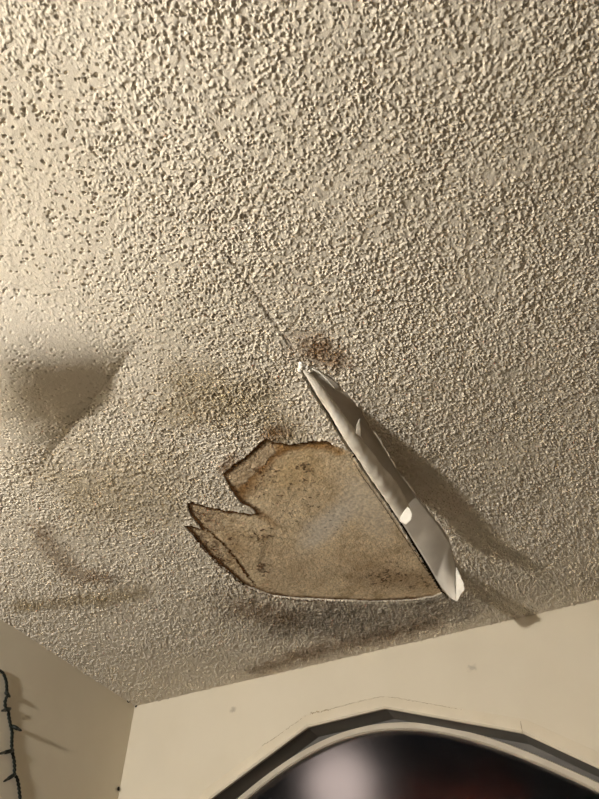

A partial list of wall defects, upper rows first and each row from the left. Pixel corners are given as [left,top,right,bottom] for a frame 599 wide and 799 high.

peeling [185,437,445,604]